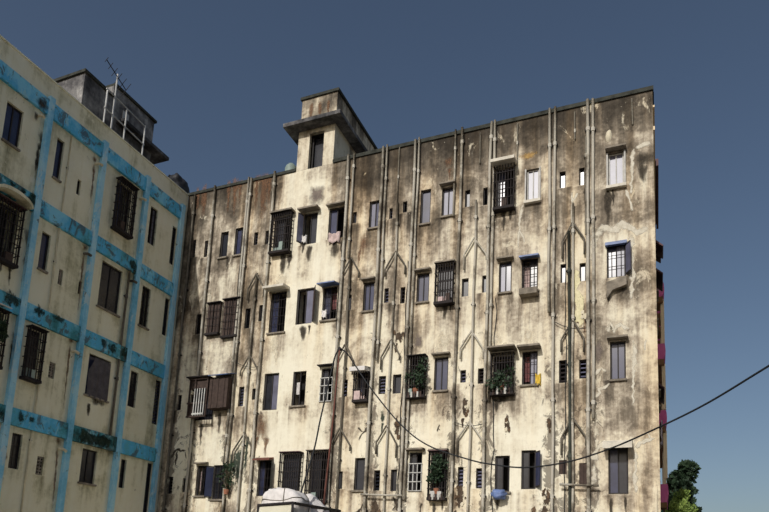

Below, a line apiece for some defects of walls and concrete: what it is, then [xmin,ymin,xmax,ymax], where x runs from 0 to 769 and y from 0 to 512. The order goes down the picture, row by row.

water stain [638,153,650,180]
spalling [531,488,550,512]